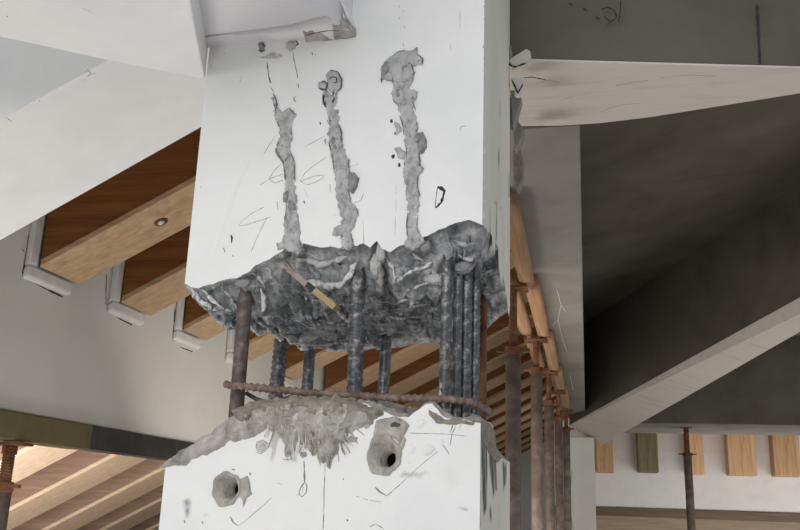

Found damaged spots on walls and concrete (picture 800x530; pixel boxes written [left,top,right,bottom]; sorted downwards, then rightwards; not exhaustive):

spalling [303,1,357,42]
spalling [160,46,545,468]